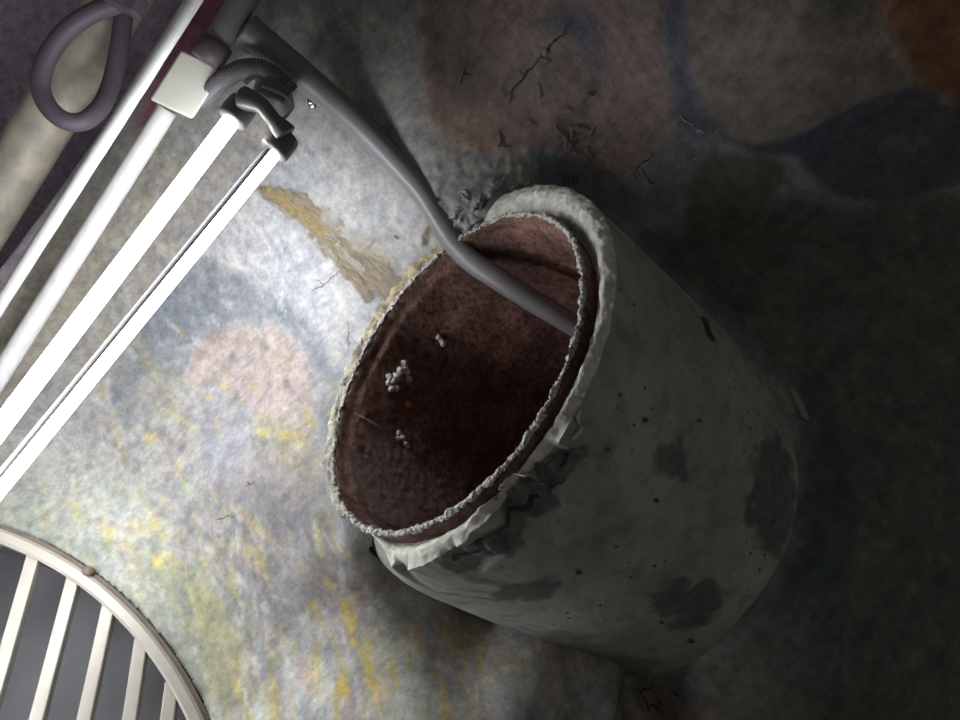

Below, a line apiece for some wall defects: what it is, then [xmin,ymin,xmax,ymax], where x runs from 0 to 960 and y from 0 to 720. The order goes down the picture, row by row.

crack [502,23,571,104]
crack [497,130,511,148]
spalling [452,410,589,568]